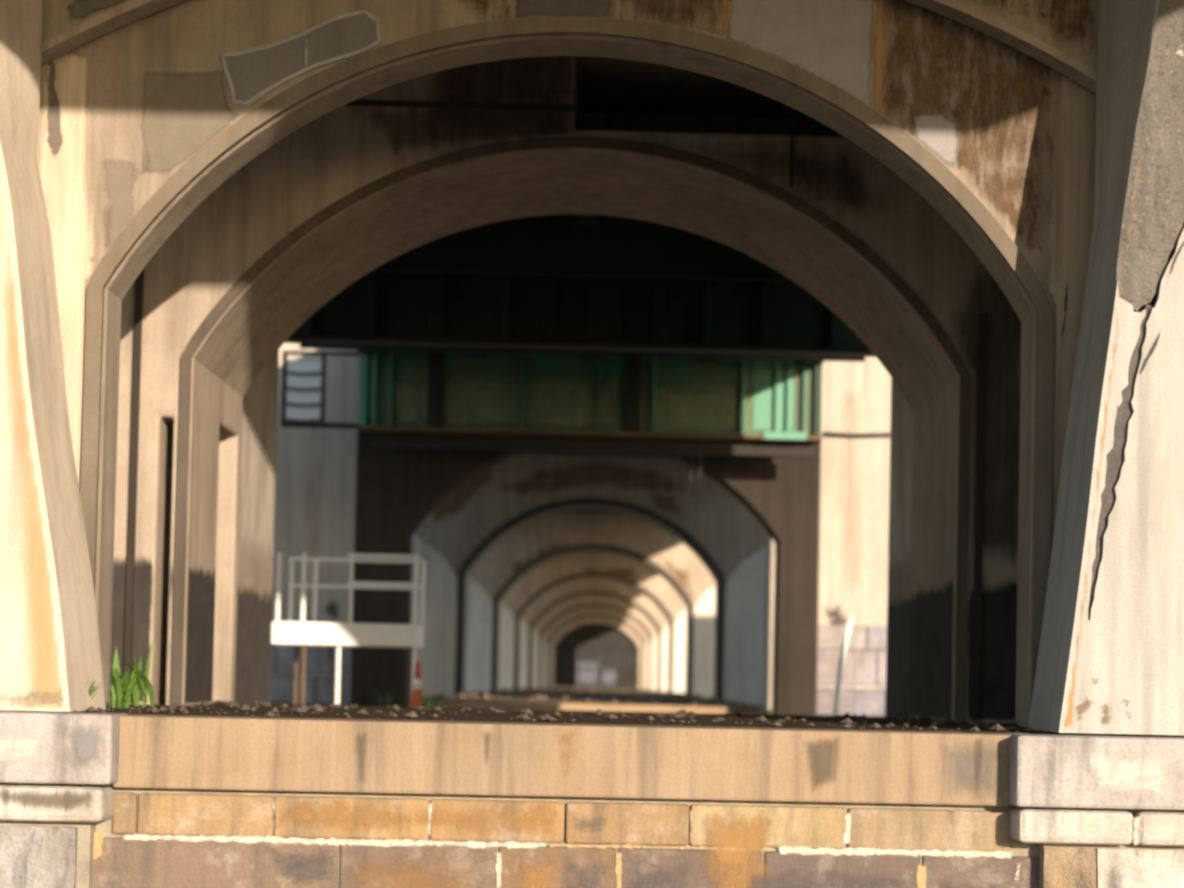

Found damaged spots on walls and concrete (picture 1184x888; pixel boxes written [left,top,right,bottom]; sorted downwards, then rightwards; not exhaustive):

peeling [68,0,126,18]
corrosion [633,0,730,33]
corrosion [874,0,1053,248]
spalling [1116,0,1184,311]
crack [1088,227,1184,620]
corrosion [709,818,764,888]